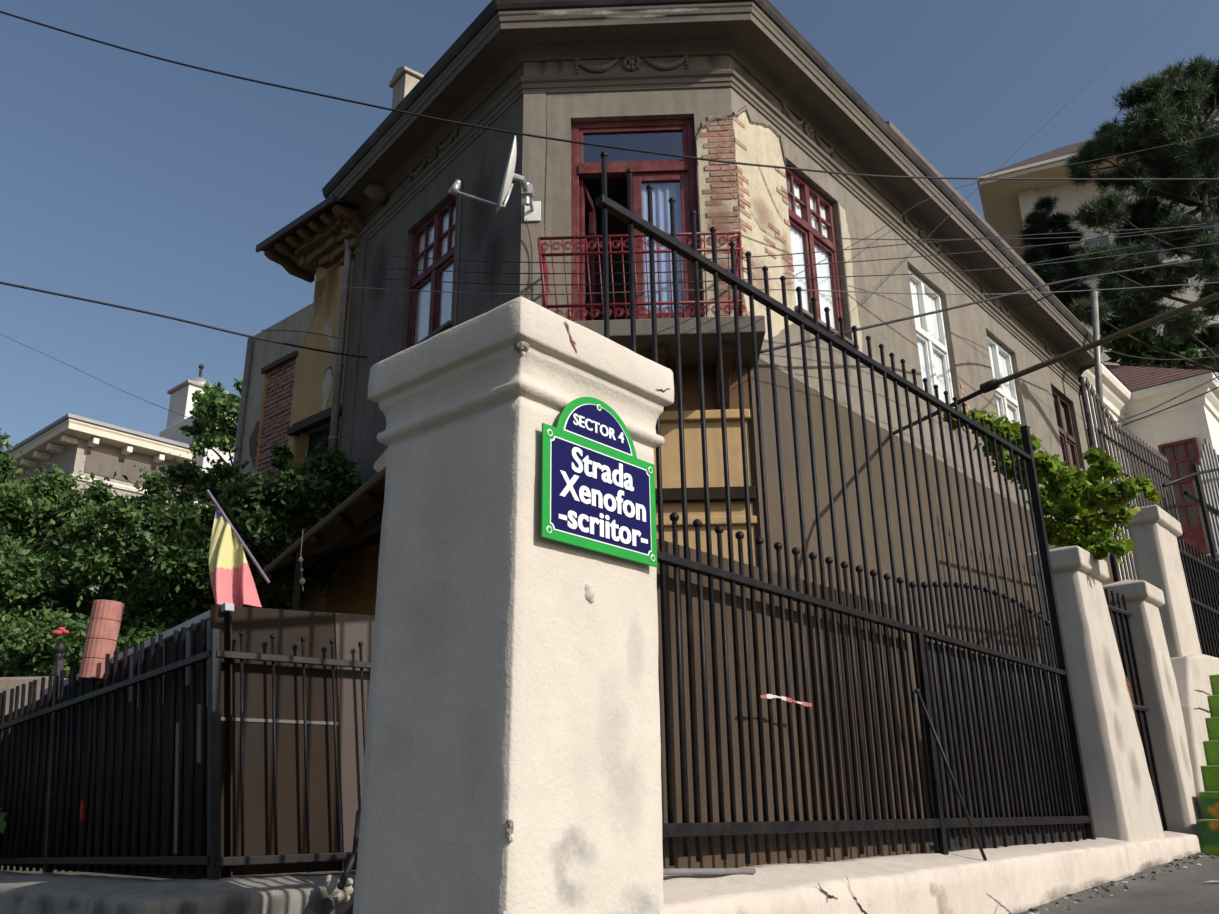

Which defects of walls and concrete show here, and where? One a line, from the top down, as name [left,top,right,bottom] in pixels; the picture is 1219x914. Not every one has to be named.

peeling [696,106,797,340]
crack [818,875,868,914]